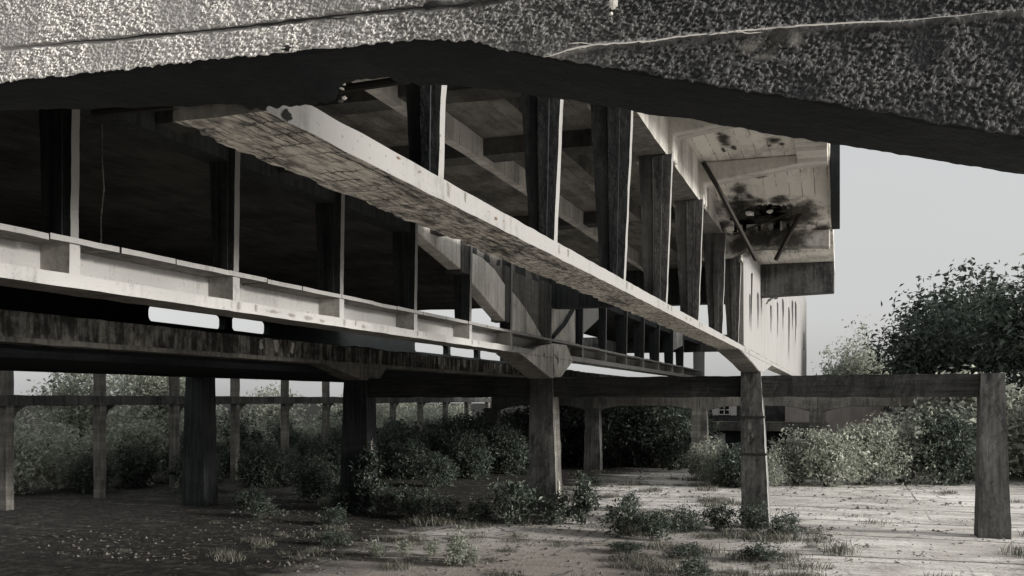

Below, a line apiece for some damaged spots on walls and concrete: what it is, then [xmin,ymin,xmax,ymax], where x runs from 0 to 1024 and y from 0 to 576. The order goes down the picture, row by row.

crack [545,9,1018,63]
damp [717,133,736,152]
damp [716,184,831,259]
damp [750,294,797,329]